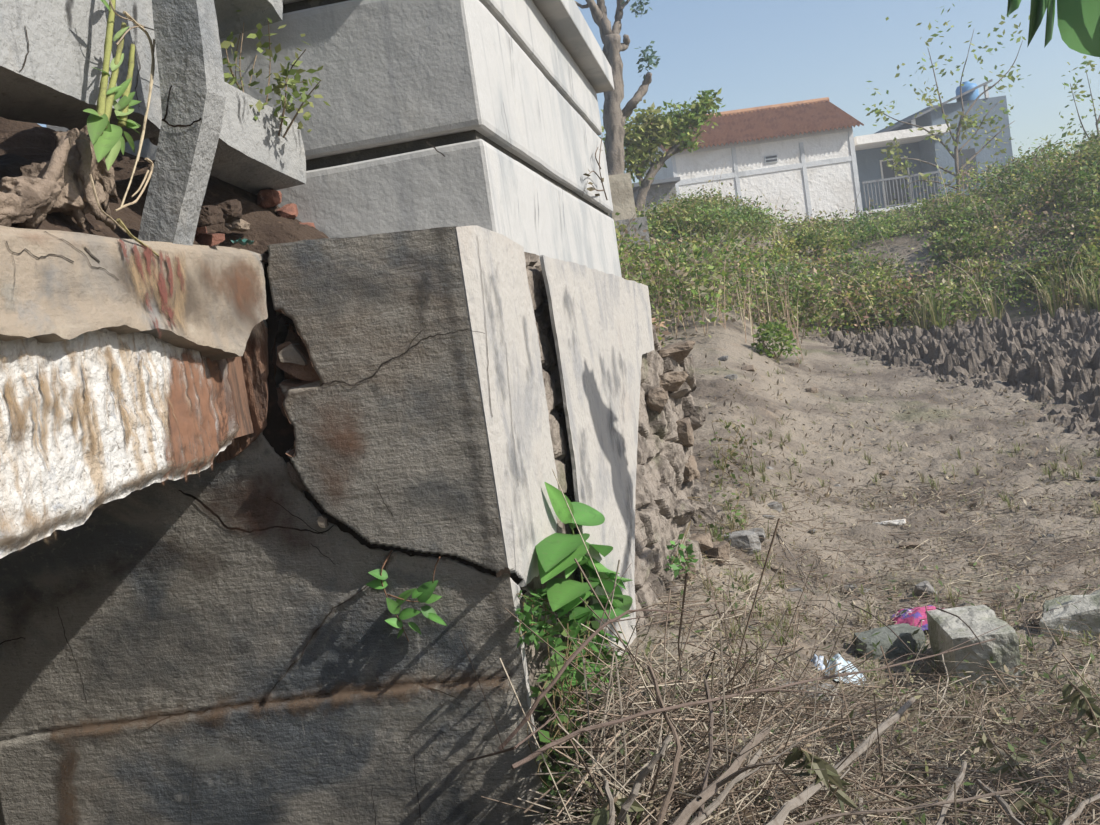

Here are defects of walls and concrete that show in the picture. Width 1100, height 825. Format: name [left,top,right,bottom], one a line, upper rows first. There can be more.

crack [133,41,201,128]
crack [6,231,119,299]
corrosion [131,256,185,323]
crack [263,252,305,463]
spalling [275,309,320,492]
crack [322,238,519,486]
spalling [0,429,239,549]
crack [178,490,527,598]
corrosion [199,551,509,725]
corrosion [52,707,185,825]